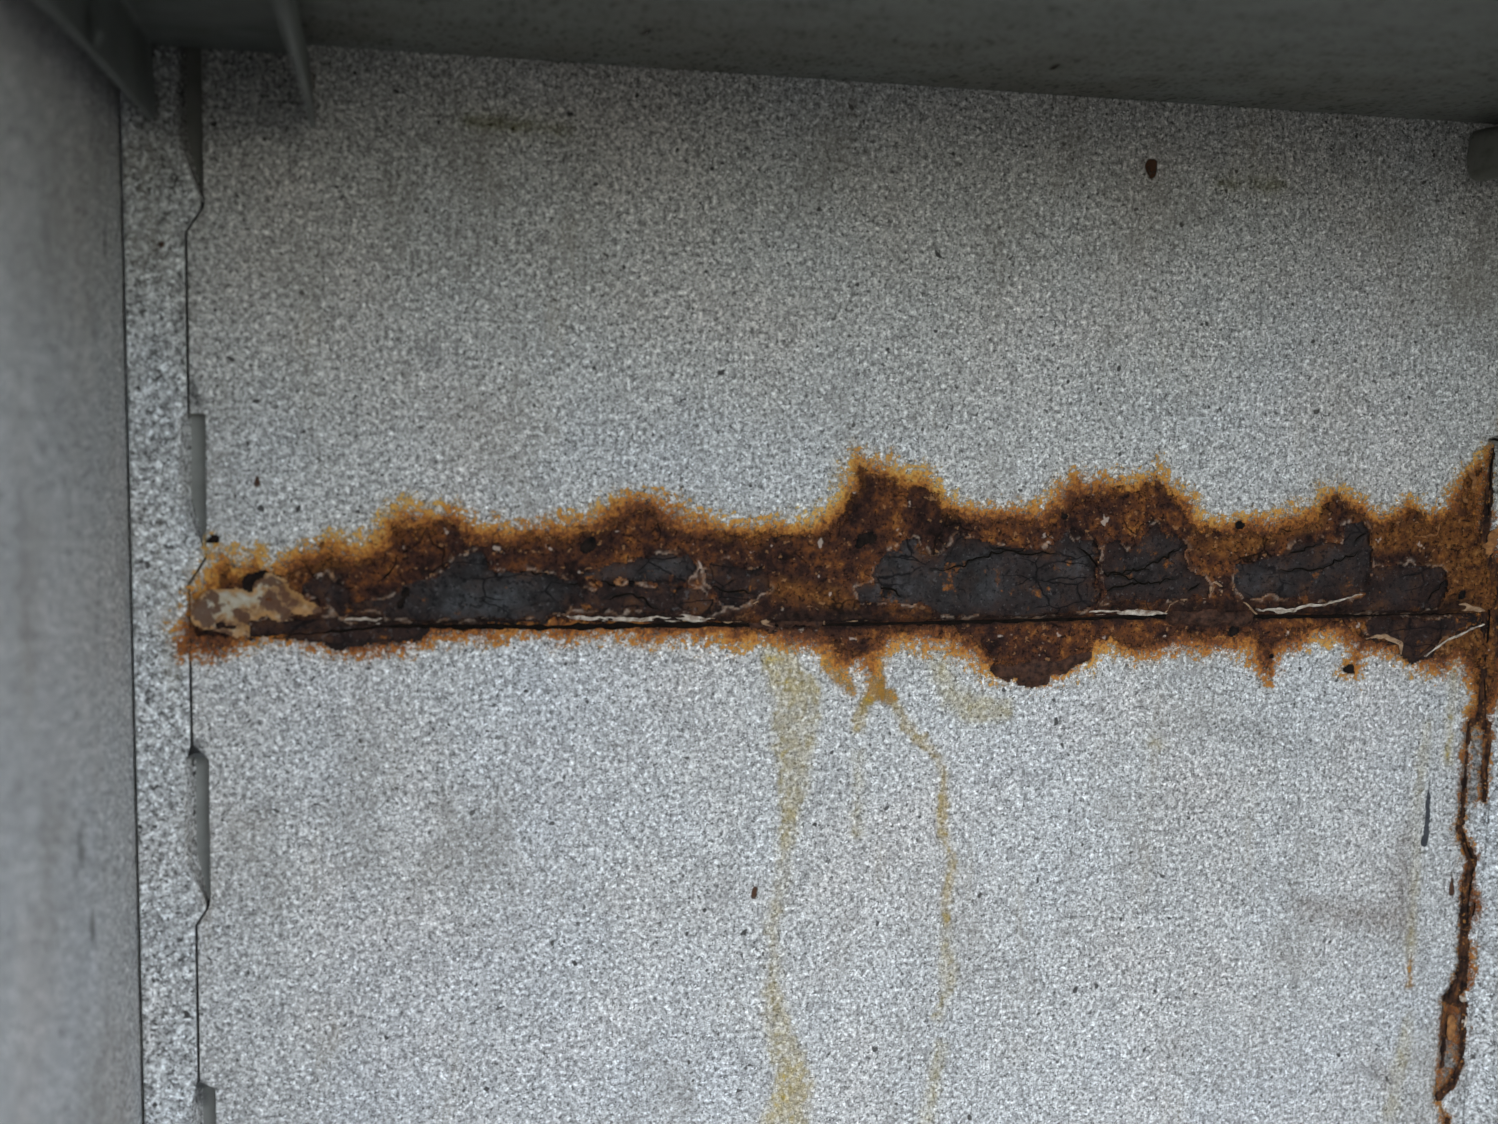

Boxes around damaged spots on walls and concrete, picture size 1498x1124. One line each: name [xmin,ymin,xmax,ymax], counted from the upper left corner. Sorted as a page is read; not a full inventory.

rust [155,419,1498,1124]